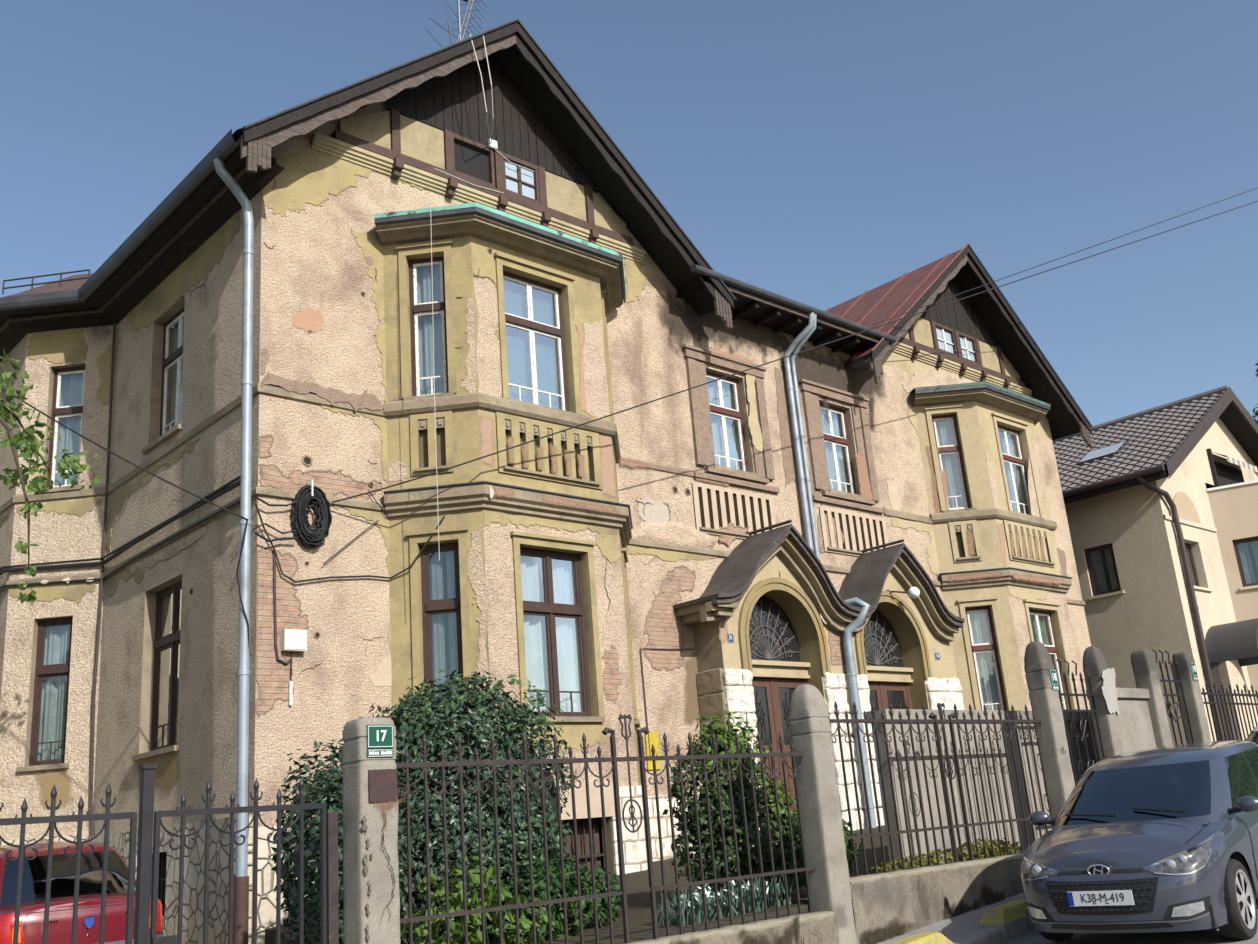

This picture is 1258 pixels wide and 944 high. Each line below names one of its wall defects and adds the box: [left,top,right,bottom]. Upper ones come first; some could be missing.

peeling [262,143,373,217]
peeling [27,328,112,407]
peeling [0,436,200,551]
spalling [259,228,411,575]
peeling [479,416,494,465]
peeling [575,318,610,419]
peeling [9,568,144,607]
spalling [256,547,309,717]
spalling [467,434,750,704]
crack [380,813,395,924]